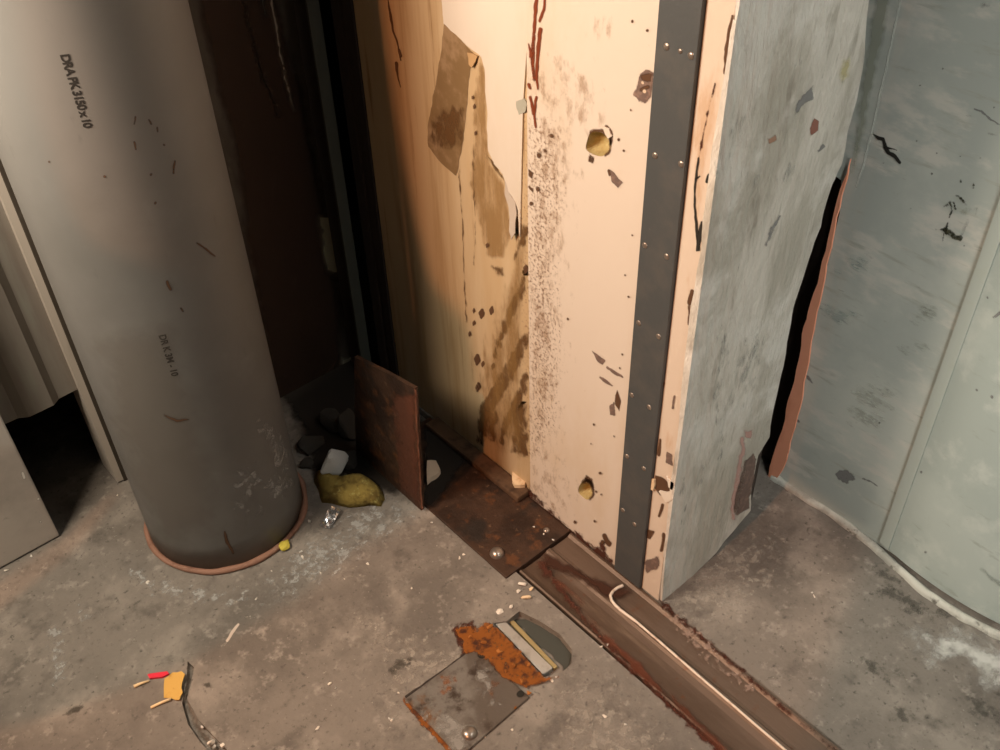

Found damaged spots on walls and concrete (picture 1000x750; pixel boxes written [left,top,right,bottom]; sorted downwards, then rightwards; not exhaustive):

rust [527,0,546,128]
peeling [442,0,527,256]
hole [586,125,613,163]
crack [873,134,901,164]
water stain [468,306,494,337]
water stain [474,121,558,456]
spalling [731,177,841,519]
hole [578,475,594,500]
rust [451,620,559,695]
rust [538,560,725,750]
rust [660,601,791,715]